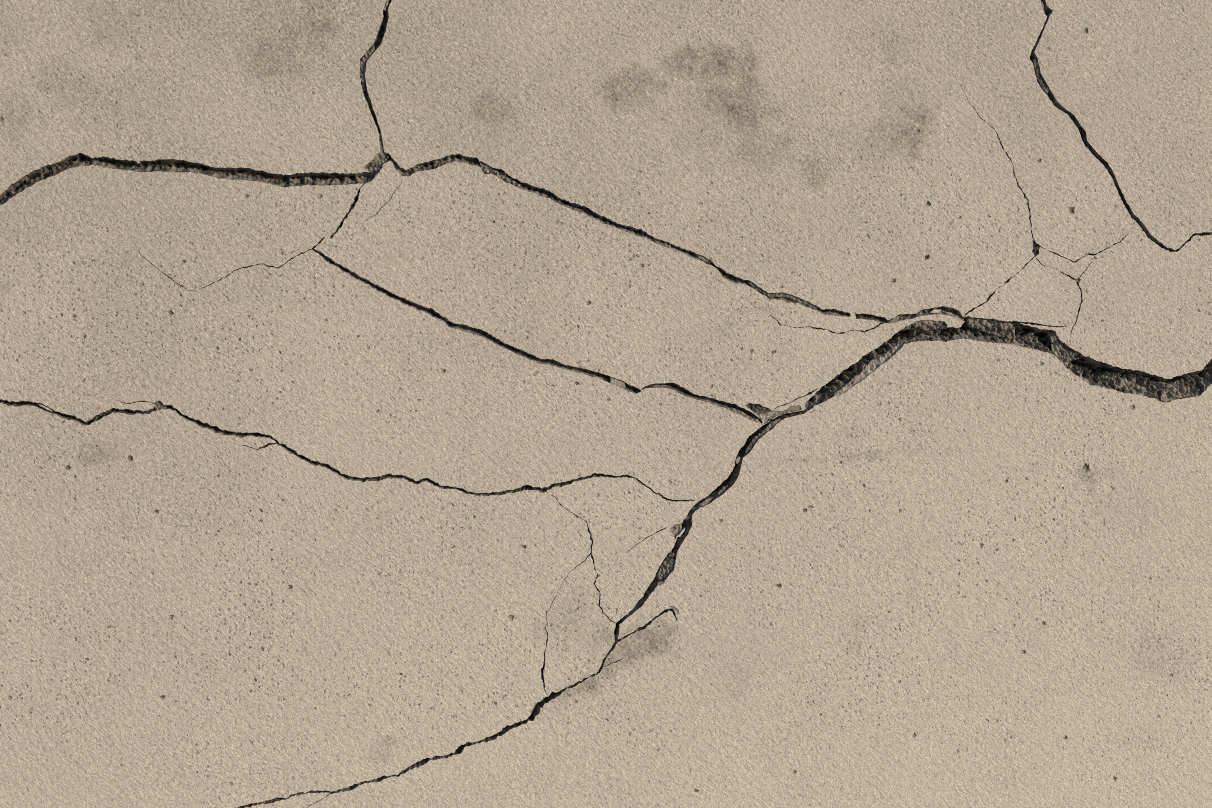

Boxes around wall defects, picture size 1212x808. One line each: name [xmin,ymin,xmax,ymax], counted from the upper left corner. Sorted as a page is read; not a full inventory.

crack [0,0,964,334]
crack [972,106,1129,338]
crack [1030,0,1212,252]
crack [0,399,694,623]
crack [188,237,1212,808]